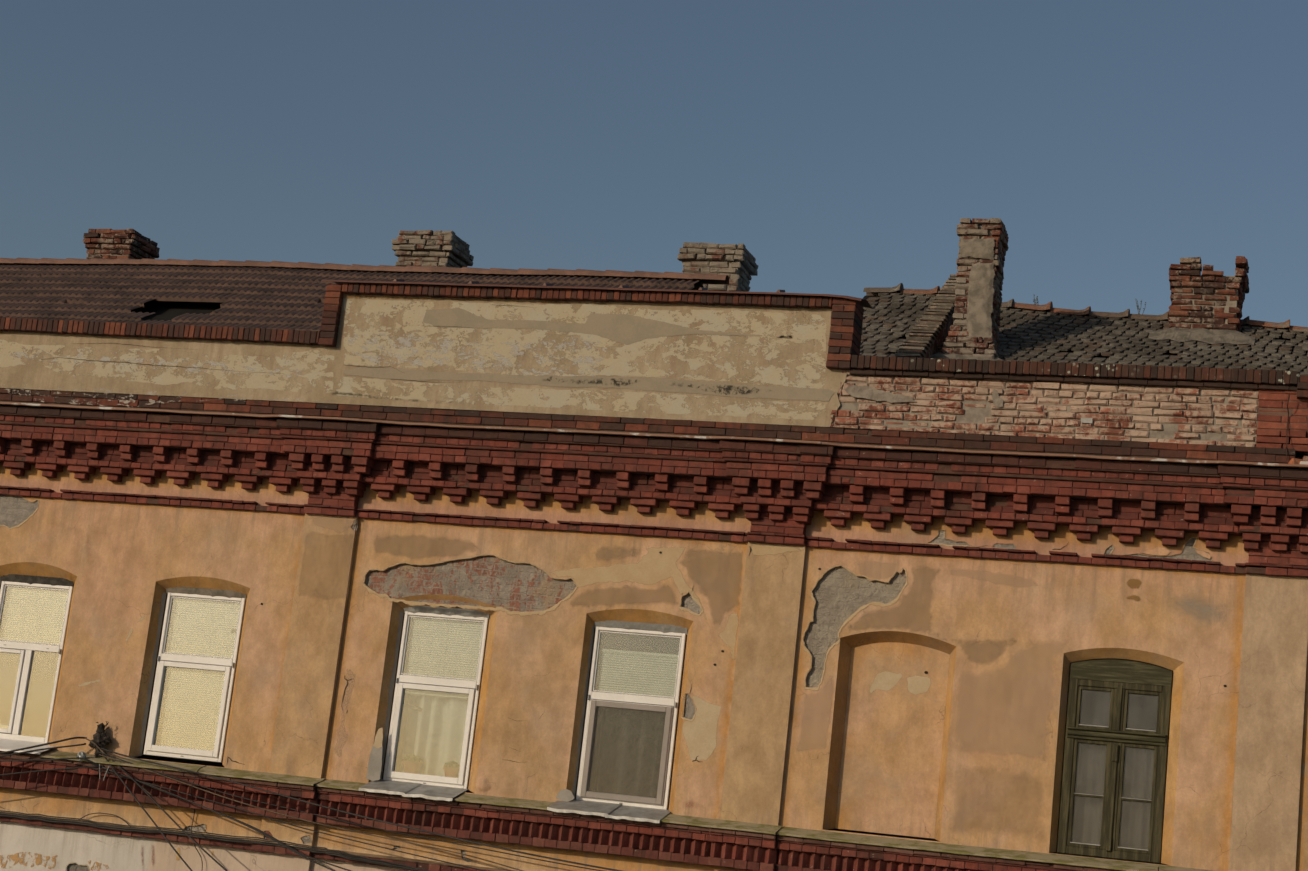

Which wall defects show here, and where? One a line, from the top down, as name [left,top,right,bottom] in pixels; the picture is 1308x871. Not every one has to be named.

flaking render [0,298,1259,448]
flaking render [0,495,39,529]
flaking render [362,554,578,616]
flaking render [679,591,703,616]
flaking render [802,565,908,691]
peeling [869,671,931,695]
peeling [0,852,108,871]